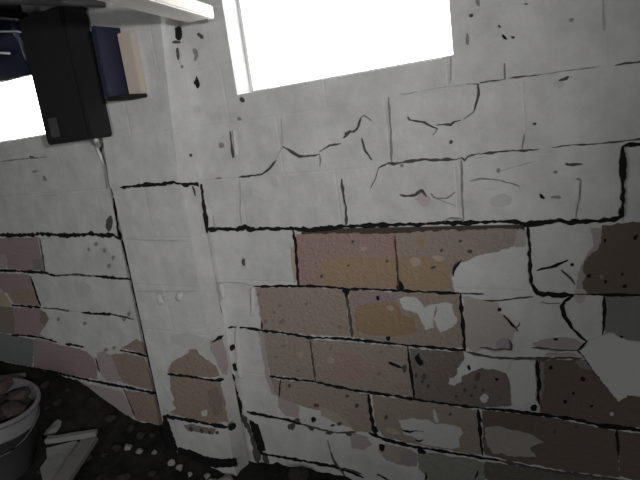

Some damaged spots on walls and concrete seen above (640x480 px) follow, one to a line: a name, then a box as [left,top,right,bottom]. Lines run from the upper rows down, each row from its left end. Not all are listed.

peeling [0,237,238,468]
crack [0,97,640,480]
spalling [255,221,640,480]